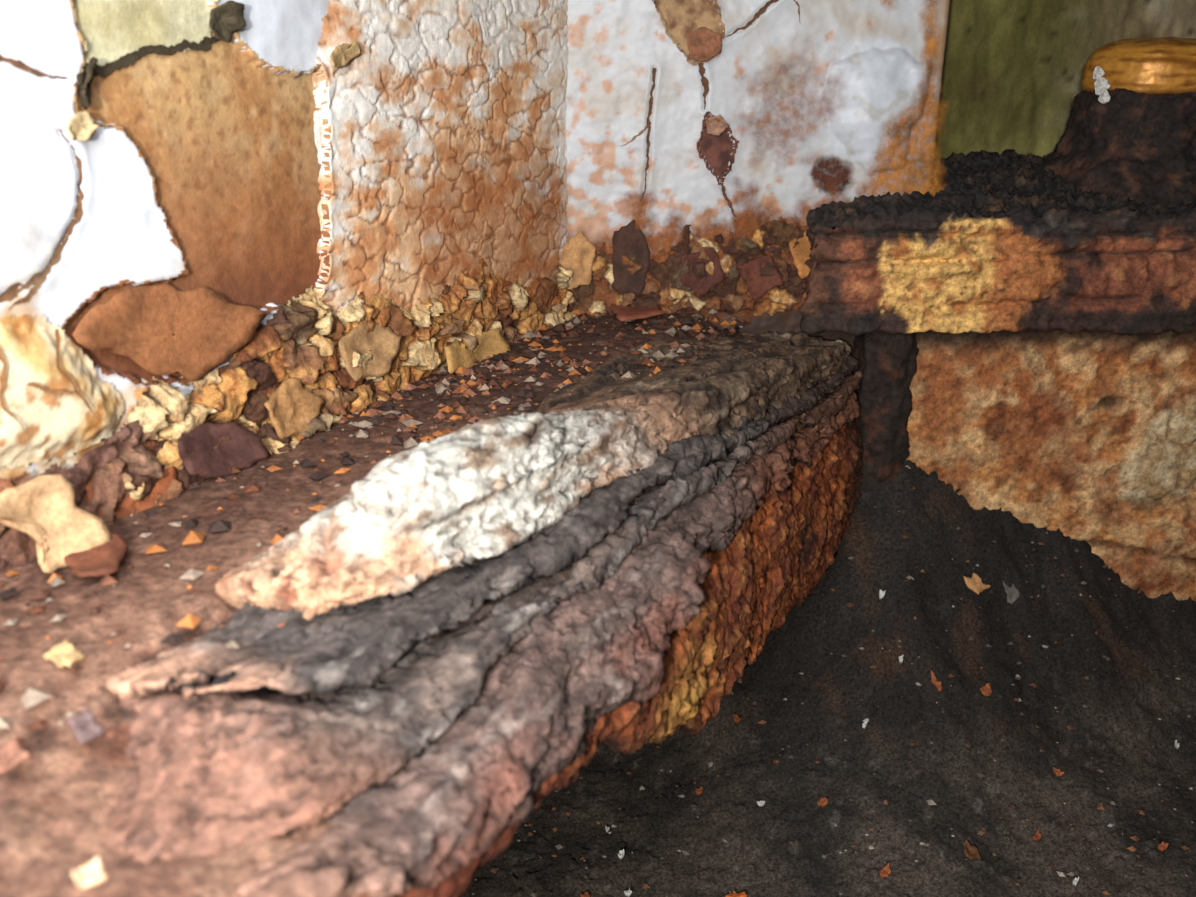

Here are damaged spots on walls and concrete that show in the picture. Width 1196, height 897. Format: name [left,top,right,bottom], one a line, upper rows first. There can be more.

crack [0,54,71,79]
peeling [654,0,725,66]
rust [864,0,941,196]
crack [0,129,84,310]
peeling [61,0,362,387]
spalling [697,112,739,185]
peeling [264,377,326,439]
peeling [86,422,271,524]
rust [0,475,113,573]
rust [66,158,864,897]
rust [963,572,1020,604]
rust [43,640,85,669]